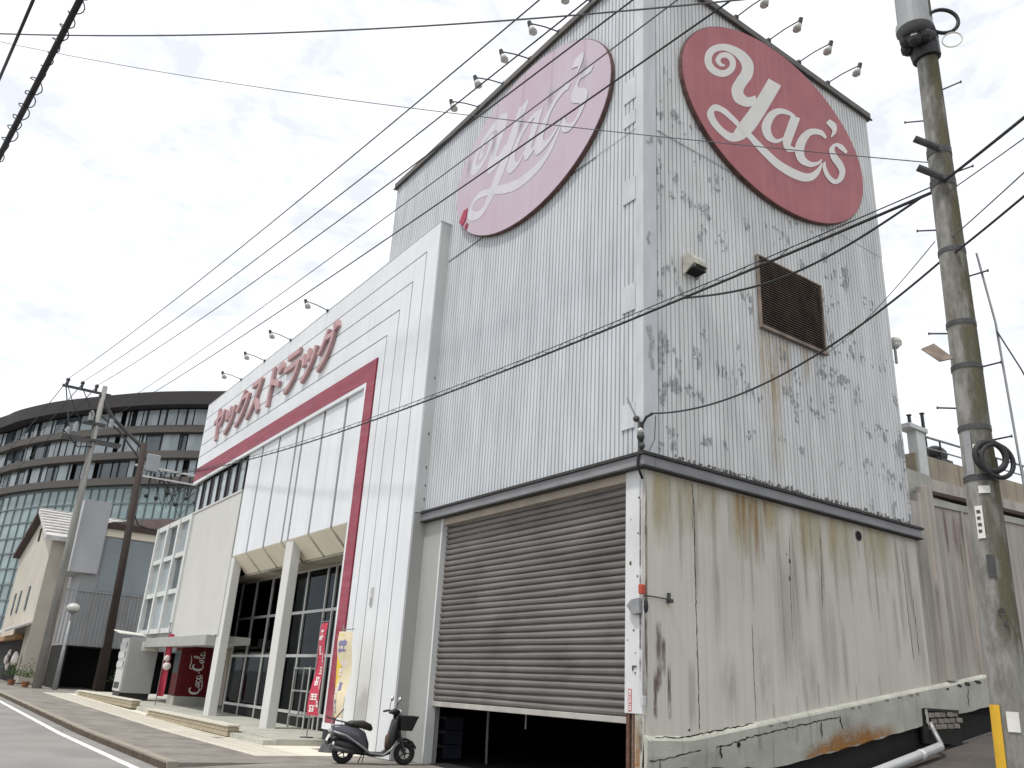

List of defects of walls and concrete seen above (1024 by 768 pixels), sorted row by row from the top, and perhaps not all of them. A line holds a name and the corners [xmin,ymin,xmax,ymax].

peeling [646,325,705,407]
peeling [716,345,763,403]
peeling [779,251,887,425]
peeling [658,422,913,525]
damp [639,475,667,599]
damp [639,614,671,715]
crack [649,486,843,768]
rust [808,731,888,758]